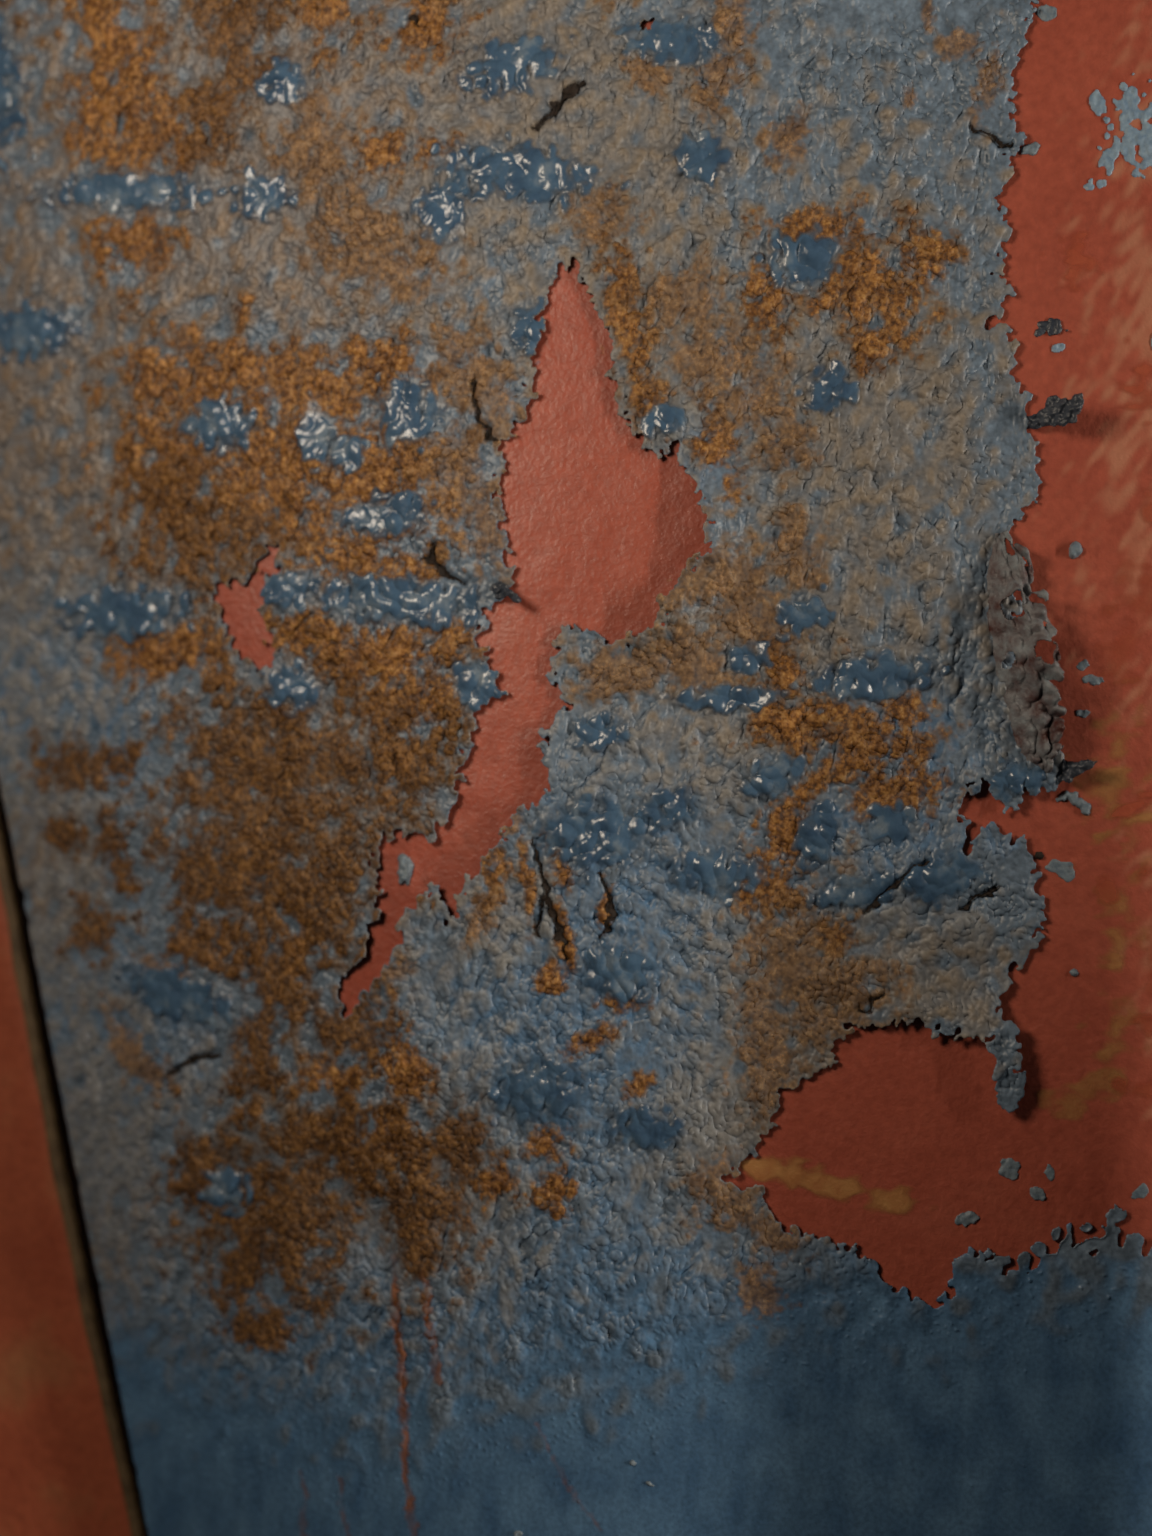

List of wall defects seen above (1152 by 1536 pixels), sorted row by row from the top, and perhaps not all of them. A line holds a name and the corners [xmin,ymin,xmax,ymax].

corrosion [693,0,756,111]
corrosion [41,0,491,301]
corrosion [82,213,191,320]
peeling [212,544,281,673]
peeling [337,257,715,1018]
corrosion [567,184,969,917]
peeling [721,0,1152,1308]
corrosion [18,293,578,1511]
corrosion [597,889,612,926]
corrosion [568,998,653,1060]
corrosion [623,1070,656,1097]
corrosion [741,1158,912,1214]